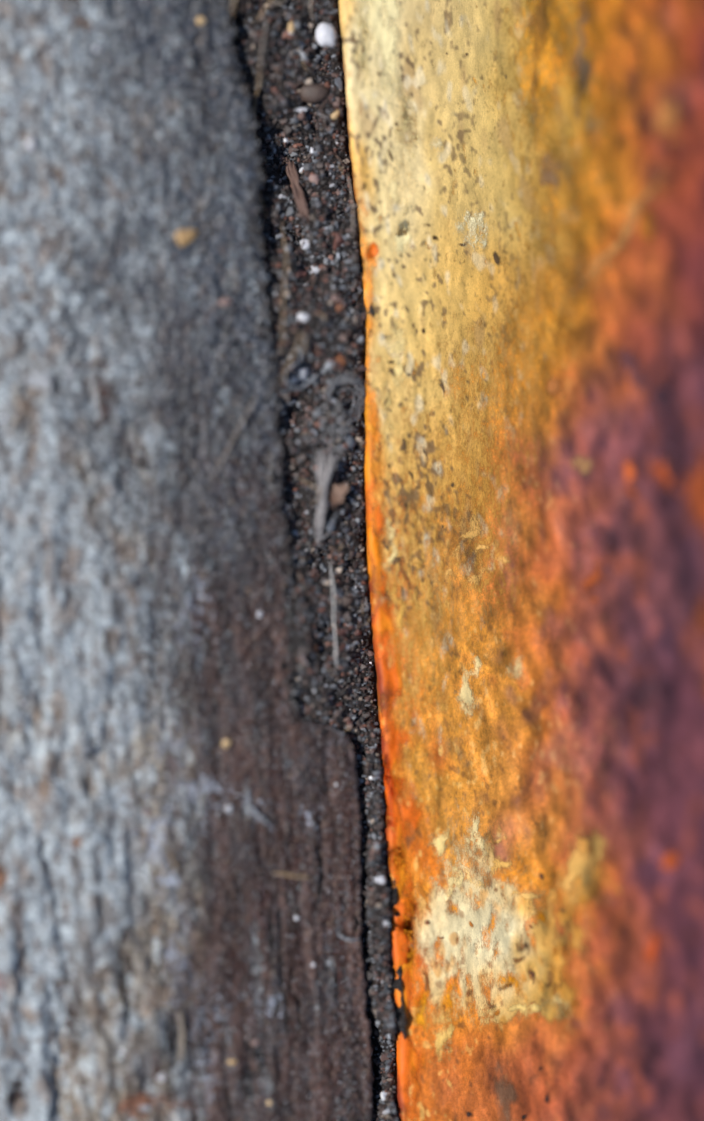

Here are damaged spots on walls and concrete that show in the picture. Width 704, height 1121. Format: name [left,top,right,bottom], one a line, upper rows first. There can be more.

corrosion [654,94,680,145]
corrosion [366,243,379,259]
water stain [53,0,293,835]
corrosion [686,451,704,525]
corrosion [365,381,427,1121]
water stain [128,793,234,1115]
water stain [255,989,283,1018]